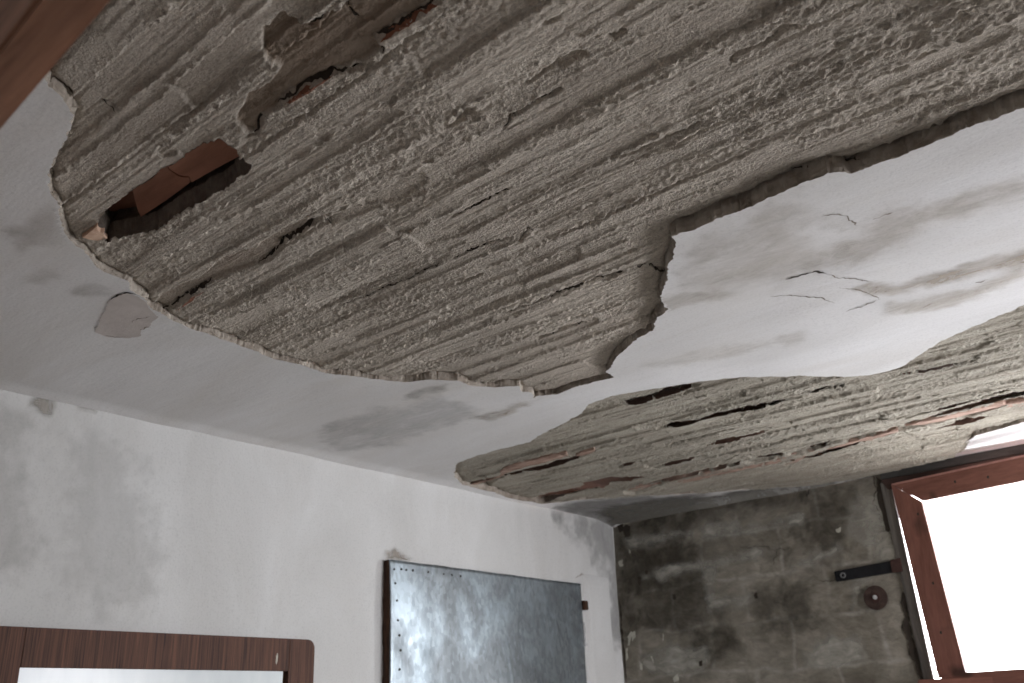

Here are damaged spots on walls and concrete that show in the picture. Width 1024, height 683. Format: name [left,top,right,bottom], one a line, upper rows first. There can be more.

spalling [45,0,1024,398]
crack [773,271,879,311]
leakage [928,269,983,284]
crack [628,384,686,401]
spalling [454,305,1024,532]
leakage [568,474,895,635]
leakage [642,631,734,673]